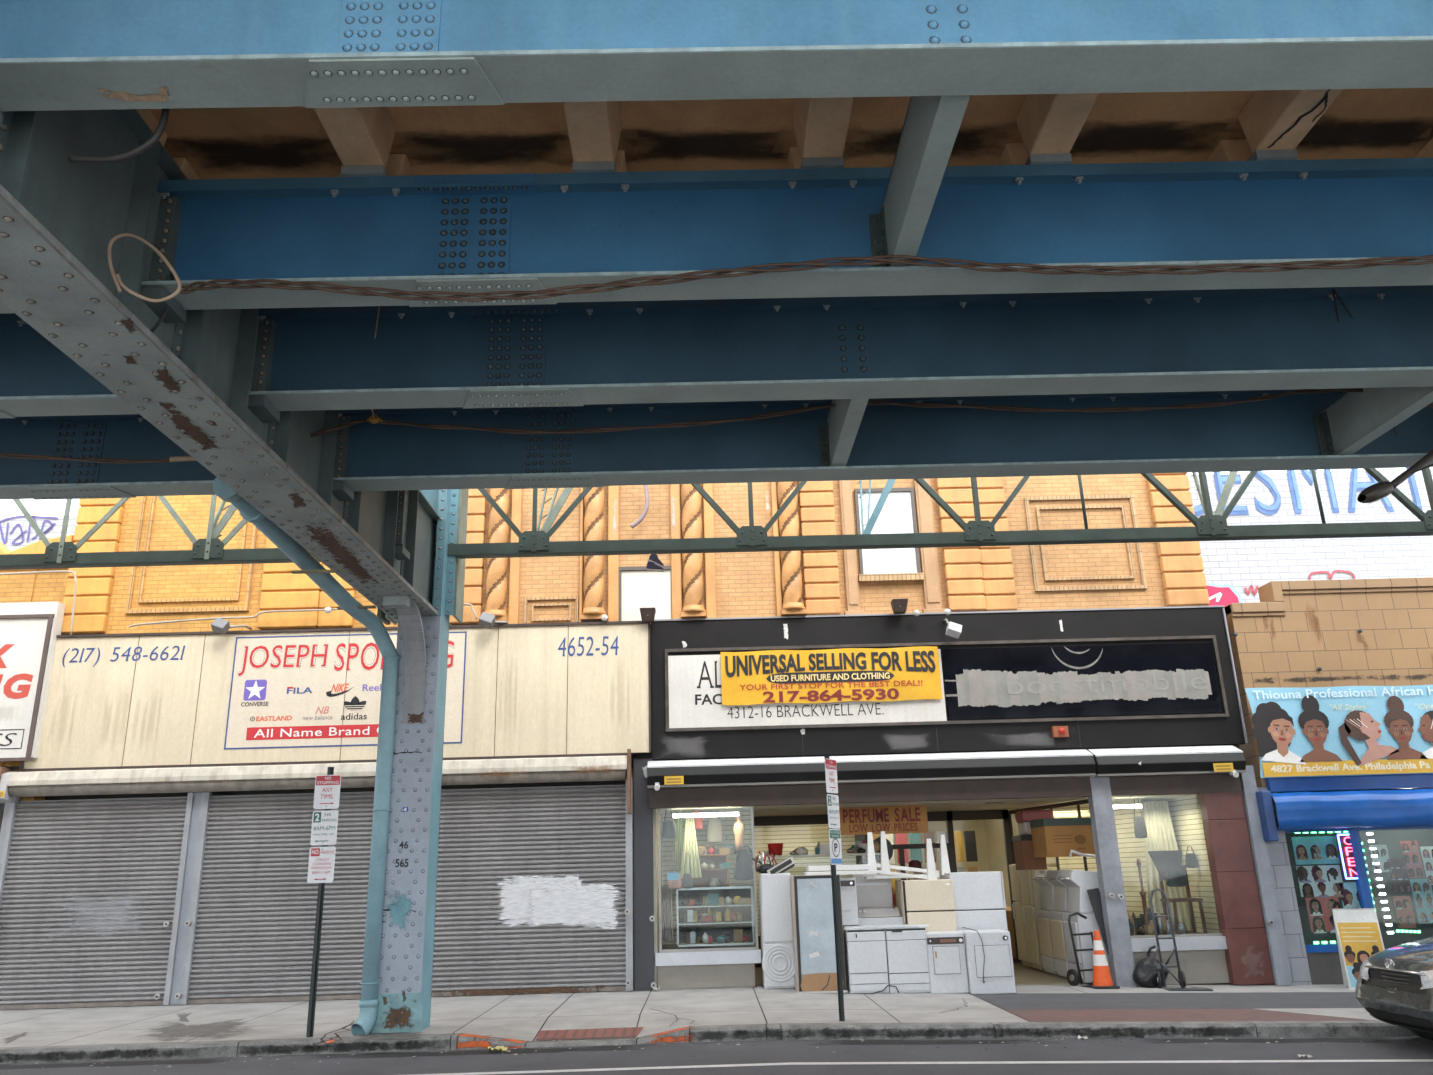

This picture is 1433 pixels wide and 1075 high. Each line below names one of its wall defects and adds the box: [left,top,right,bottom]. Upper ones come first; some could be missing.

crack [1268,89,1331,148]
corrosion [159,402,218,450]
corrosion [290,493,306,508]
corrosion [306,523,384,588]
corrosion [382,991,412,1028]